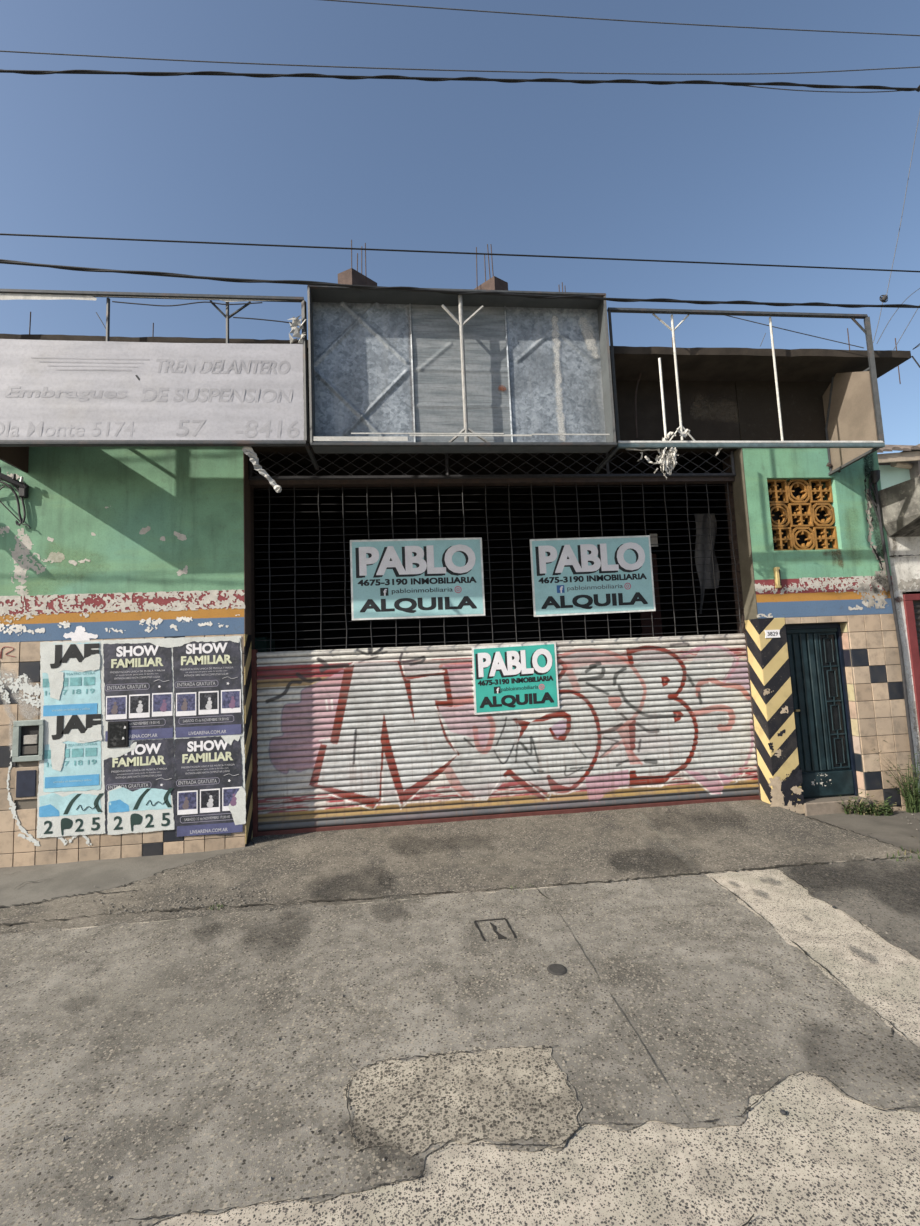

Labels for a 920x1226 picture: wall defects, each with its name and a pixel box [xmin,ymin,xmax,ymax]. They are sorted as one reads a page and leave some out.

peeling [0,526,245,636]
peeling [755,489,920,773]
peeling [769,769,805,814]